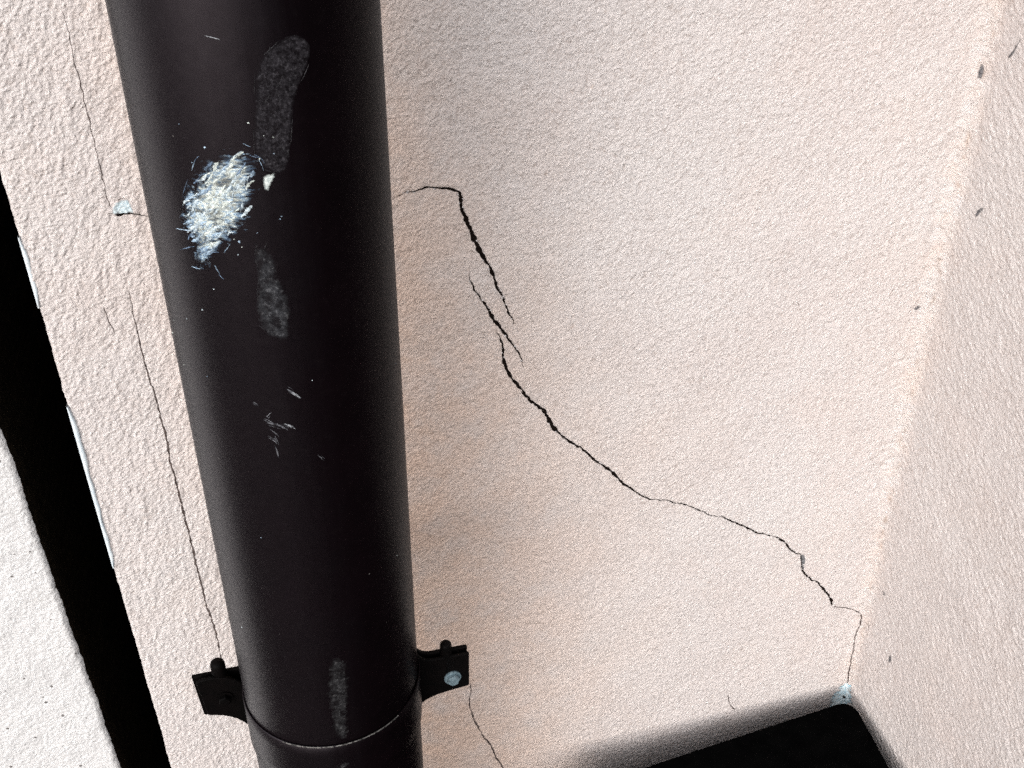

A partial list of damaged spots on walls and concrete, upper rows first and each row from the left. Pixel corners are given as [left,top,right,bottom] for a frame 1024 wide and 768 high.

crack [395,186,862,683]
crack [469,684,503,768]